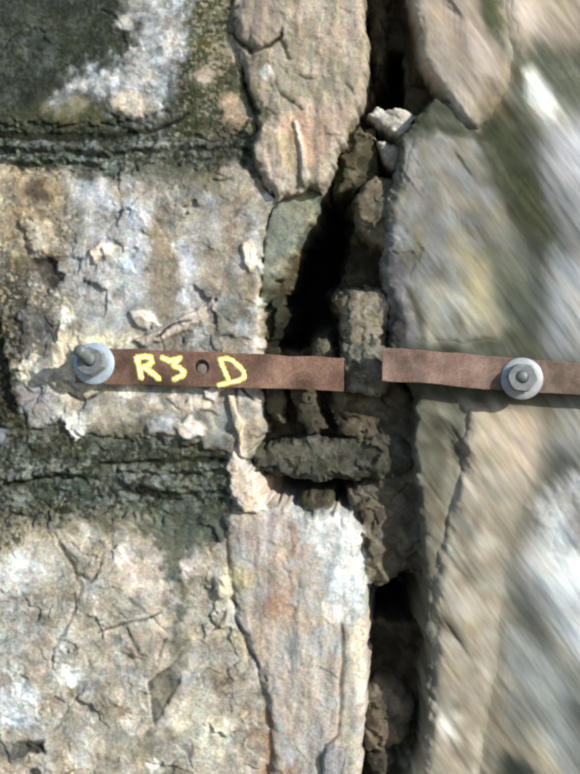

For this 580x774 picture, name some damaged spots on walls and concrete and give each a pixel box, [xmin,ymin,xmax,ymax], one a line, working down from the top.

efflorescence [50,0,190,120]
crack [234,29,313,114]
crack [346,0,435,130]
crack [266,218,383,357]
leakage [61,414,89,440]
crack [235,388,253,410]
crack [262,389,337,442]
crack [362,586,421,774]